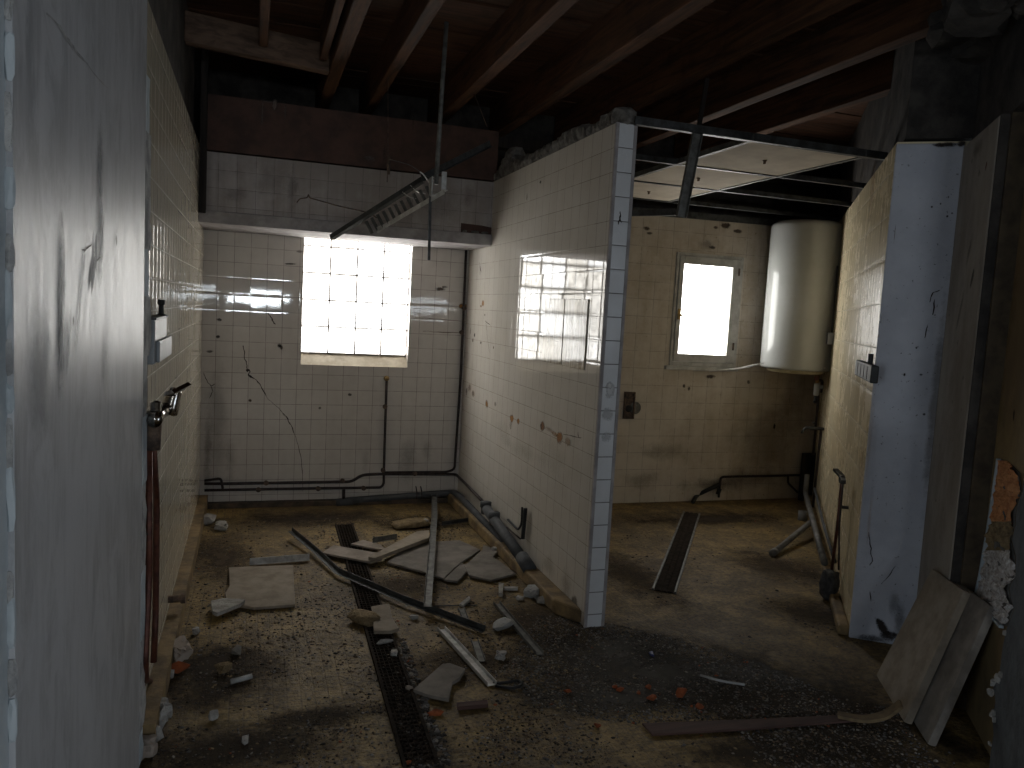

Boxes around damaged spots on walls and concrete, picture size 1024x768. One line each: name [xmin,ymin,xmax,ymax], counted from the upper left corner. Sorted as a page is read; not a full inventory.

spalling [494,107,637,181]
crack [243,346,303,492]
flaking render [974,458,1021,636]